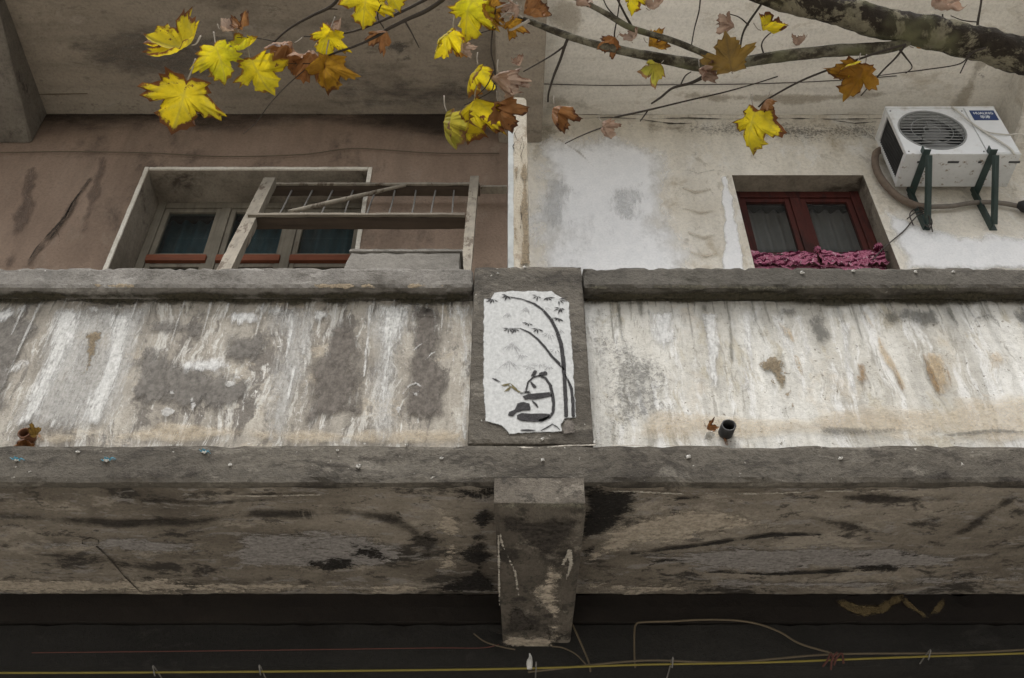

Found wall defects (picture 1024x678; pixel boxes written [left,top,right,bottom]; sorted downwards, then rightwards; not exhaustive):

crack [30,182,87,258]
damp [232,307,293,352]
damp [134,333,268,410]
damp [306,304,467,422]
rust [924,358,950,391]
damp [65,518,216,528]
damp [204,495,312,518]
damp [825,490,947,504]
crack [82,537,140,592]
damp [0,577,308,595]
damp [307,542,387,571]
damp [328,486,761,646]